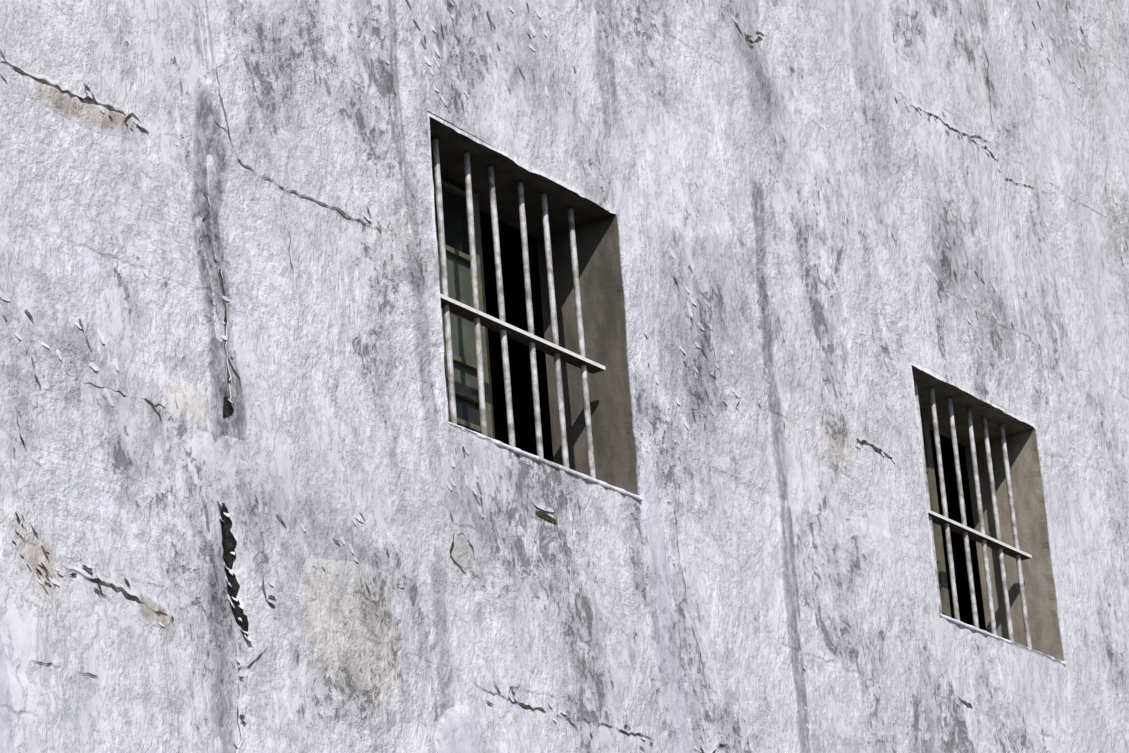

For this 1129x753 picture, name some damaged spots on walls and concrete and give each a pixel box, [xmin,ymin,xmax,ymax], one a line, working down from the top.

crack [0,49,149,133]
flaking render [0,199,526,730]
spalling [535,505,557,524]
crack [476,683,653,750]
crack [694,743,736,753]